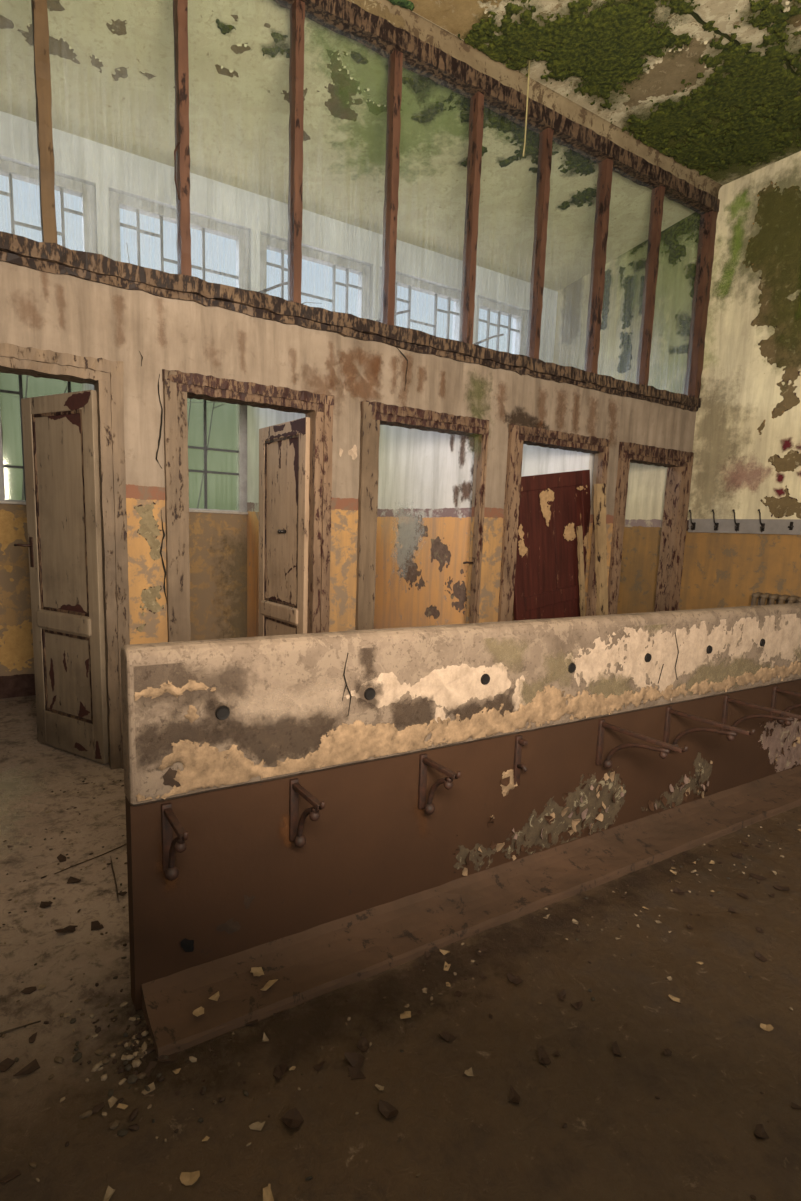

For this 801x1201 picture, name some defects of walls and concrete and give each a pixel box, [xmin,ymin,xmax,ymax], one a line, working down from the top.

peeling [49,36,156,81]
peeling [106,19,128,36]
peeling [267,49,386,122]
peeling [347,0,502,40]
peeling [613,37,719,107]
crack [679,1,801,92]
peeling [742,181,801,435]
peeling [760,450,801,519]
peeling [394,511,467,619]
peeling [134,614,801,802]
peeling [641,750,713,813]
peeling [453,766,626,876]